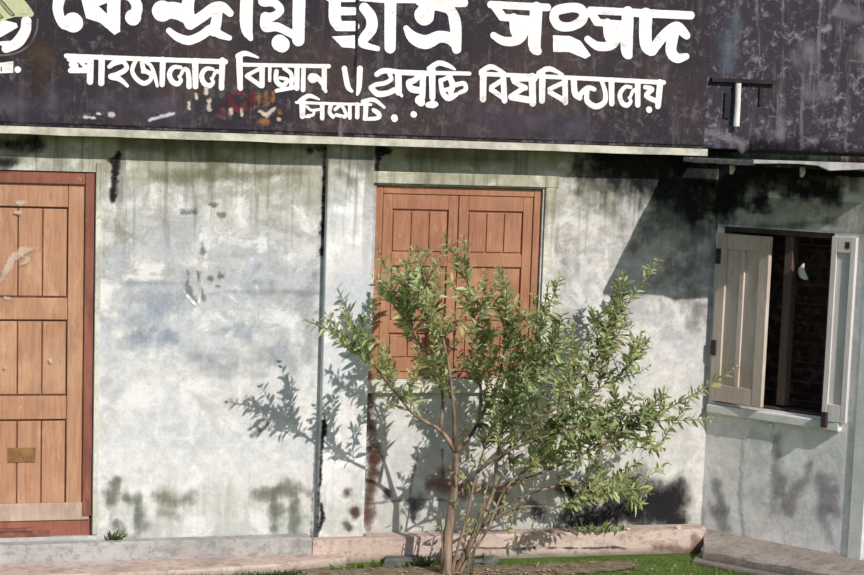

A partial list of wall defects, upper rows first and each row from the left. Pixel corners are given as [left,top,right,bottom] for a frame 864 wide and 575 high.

leakage [0,135,45,169]
leakage [108,151,121,203]
leakage [153,141,280,182]
leakage [574,130,864,238]
leakage [106,477,145,530]
leakage [157,492,191,506]
leakage [254,481,300,533]
leakage [409,497,421,518]
leakage [556,469,689,528]
leakage [712,480,729,530]
leakage [772,437,840,535]